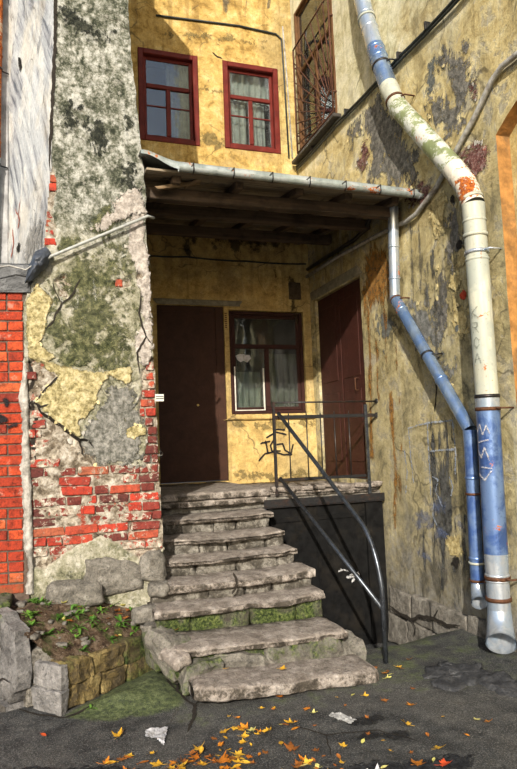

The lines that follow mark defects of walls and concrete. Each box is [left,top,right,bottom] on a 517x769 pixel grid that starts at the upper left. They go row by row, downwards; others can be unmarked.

peeling [344,88,470,386]
peeling [424,39,478,146]
spalling [459,136,491,176]
spalling [25,185,164,568]
crack [136,293,151,373]
rust [362,241,398,458]
water stain [413,417,471,603]
crack [389,605,460,635]